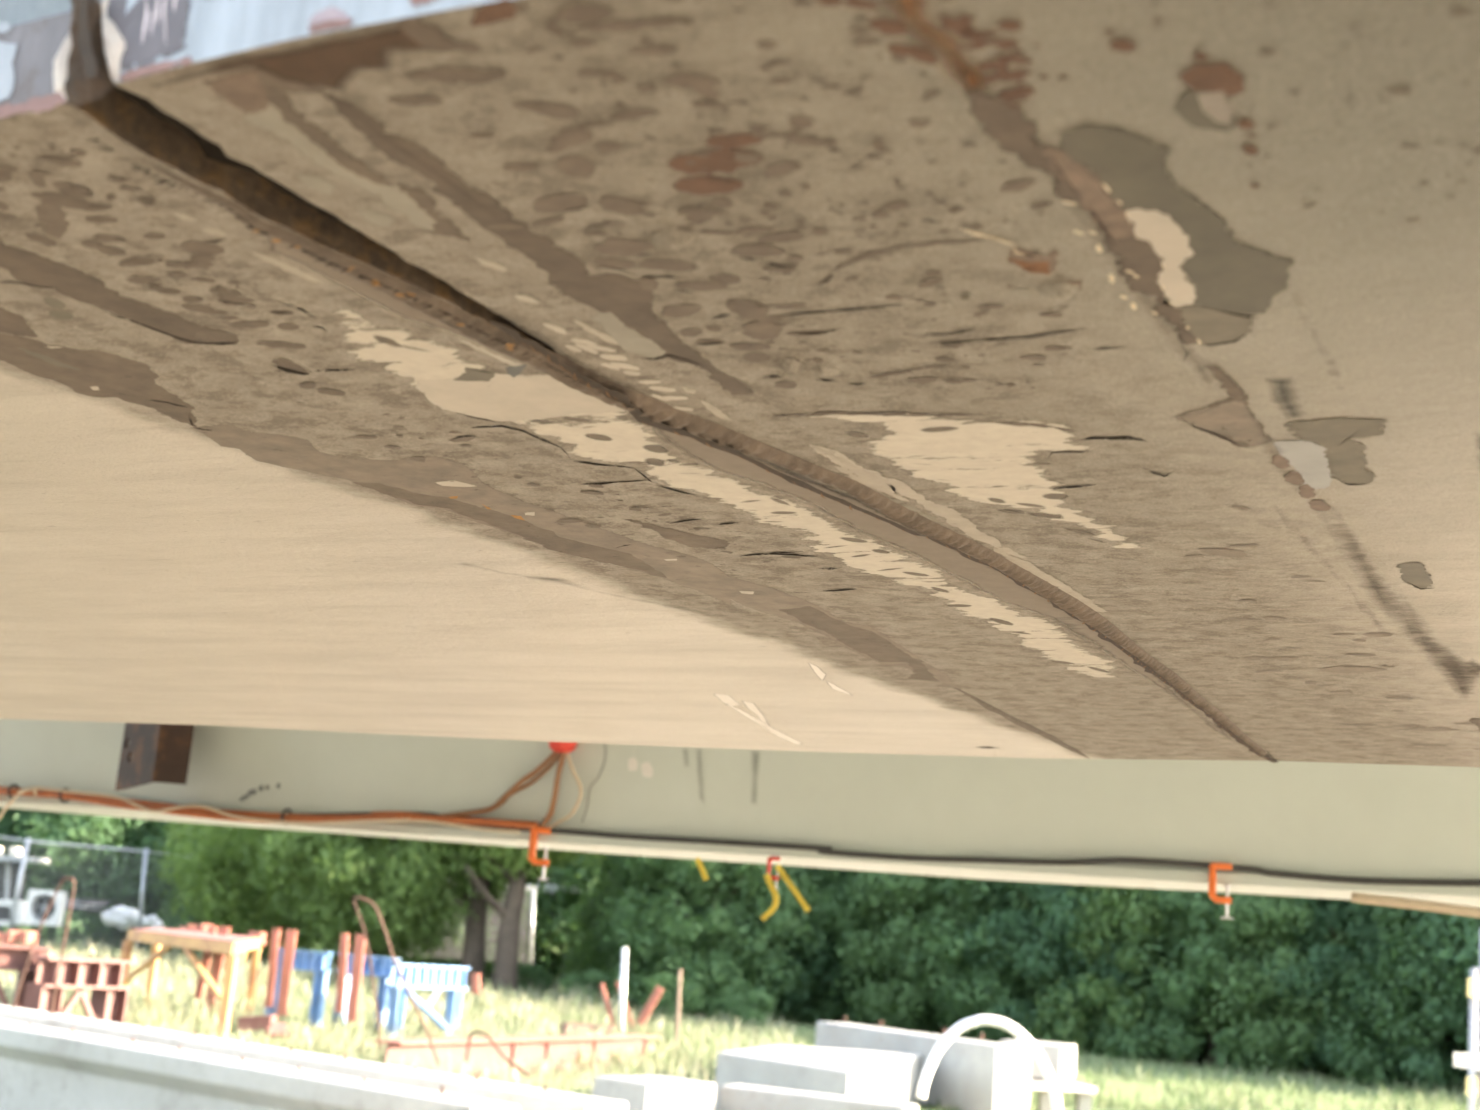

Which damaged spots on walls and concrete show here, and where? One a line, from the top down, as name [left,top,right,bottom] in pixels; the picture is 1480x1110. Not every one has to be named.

peeling [0,22,18,101]
spalling [915,0,1069,108]
corrosion [1175,52,1259,155]
leakage [267,235,501,352]
peeling [203,0,1018,421]
corrosion [816,0,1203,360]
peeling [1061,124,1295,346]
peeling [1175,365,1387,489]
leakage [658,429,1179,699]
spalling [1283,633,1393,741]
spalling [1385,697,1480,750]